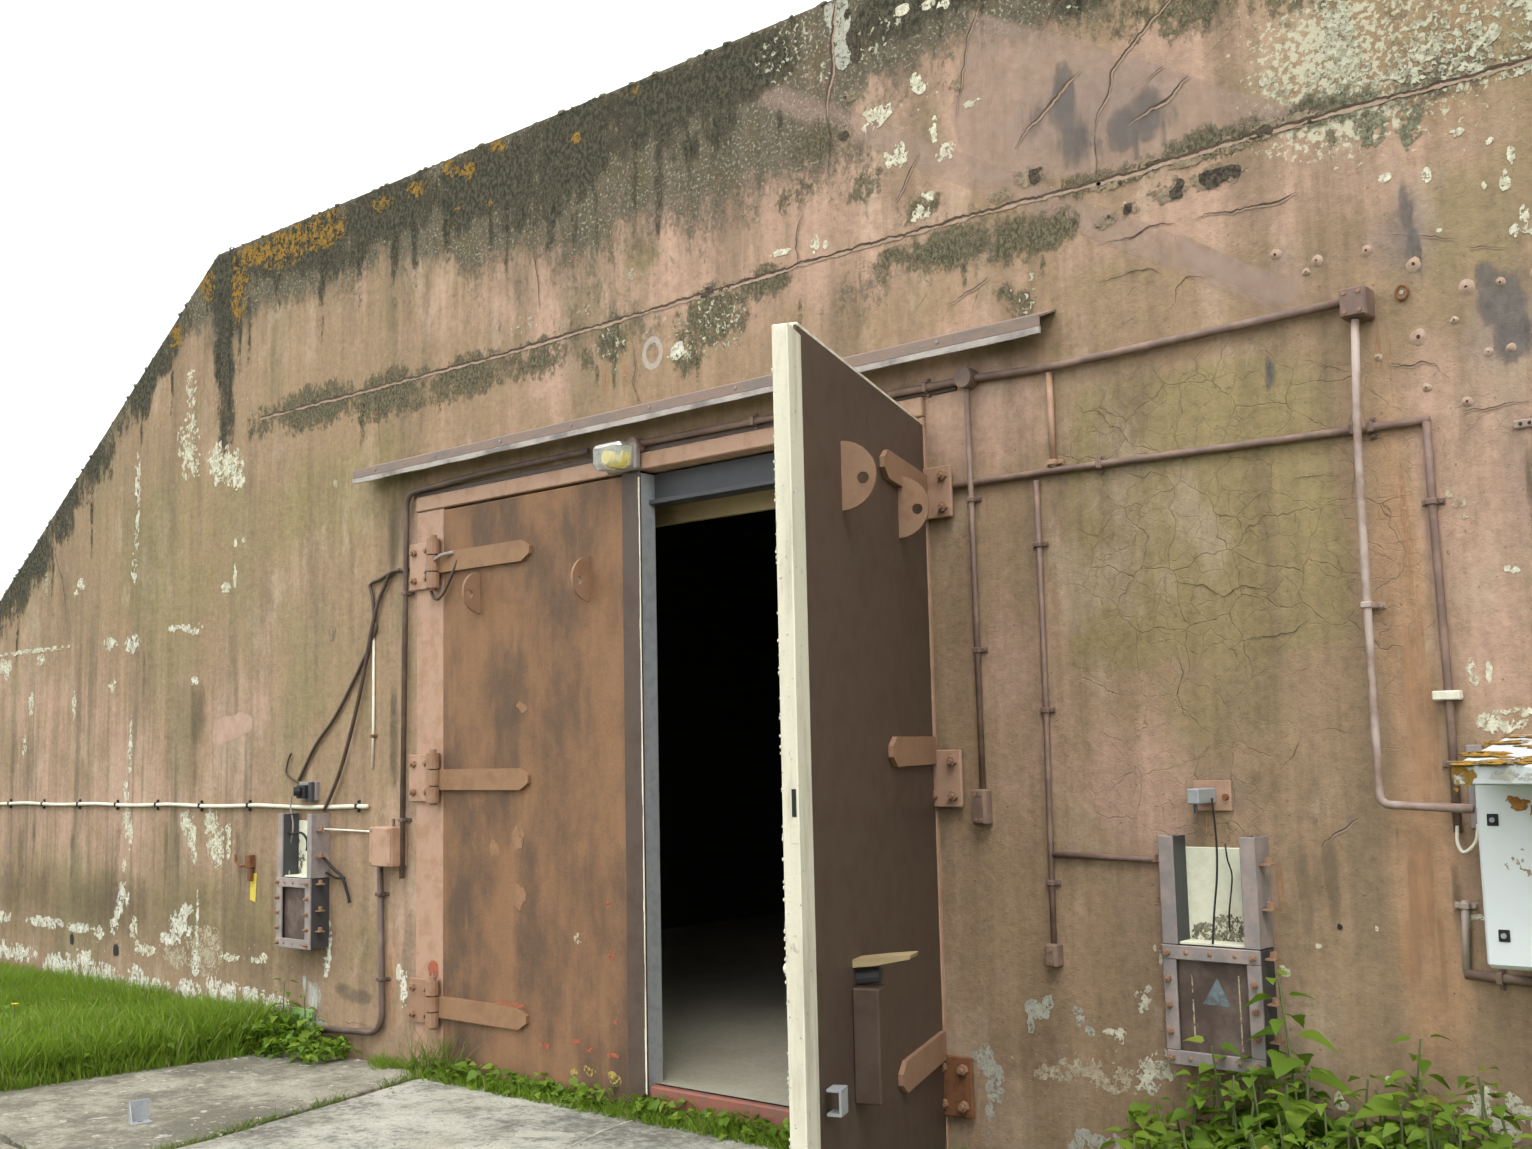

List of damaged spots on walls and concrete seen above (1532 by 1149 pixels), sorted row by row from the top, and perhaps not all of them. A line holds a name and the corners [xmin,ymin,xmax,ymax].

water stain [390,223,419,287]
water stain [632,129,663,236]
crack [261,0,1532,441]
peeling [911,191,934,222]
water stain [213,258,251,452]
water stain [1476,264,1529,360]
peeling [177,370,245,490]
crack [1174,576,1285,612]
crack [1233,619,1309,670]
peeling [1475,707,1532,734]
peeling [0,712,291,1014]
peeling [1034,1049,1176,1096]